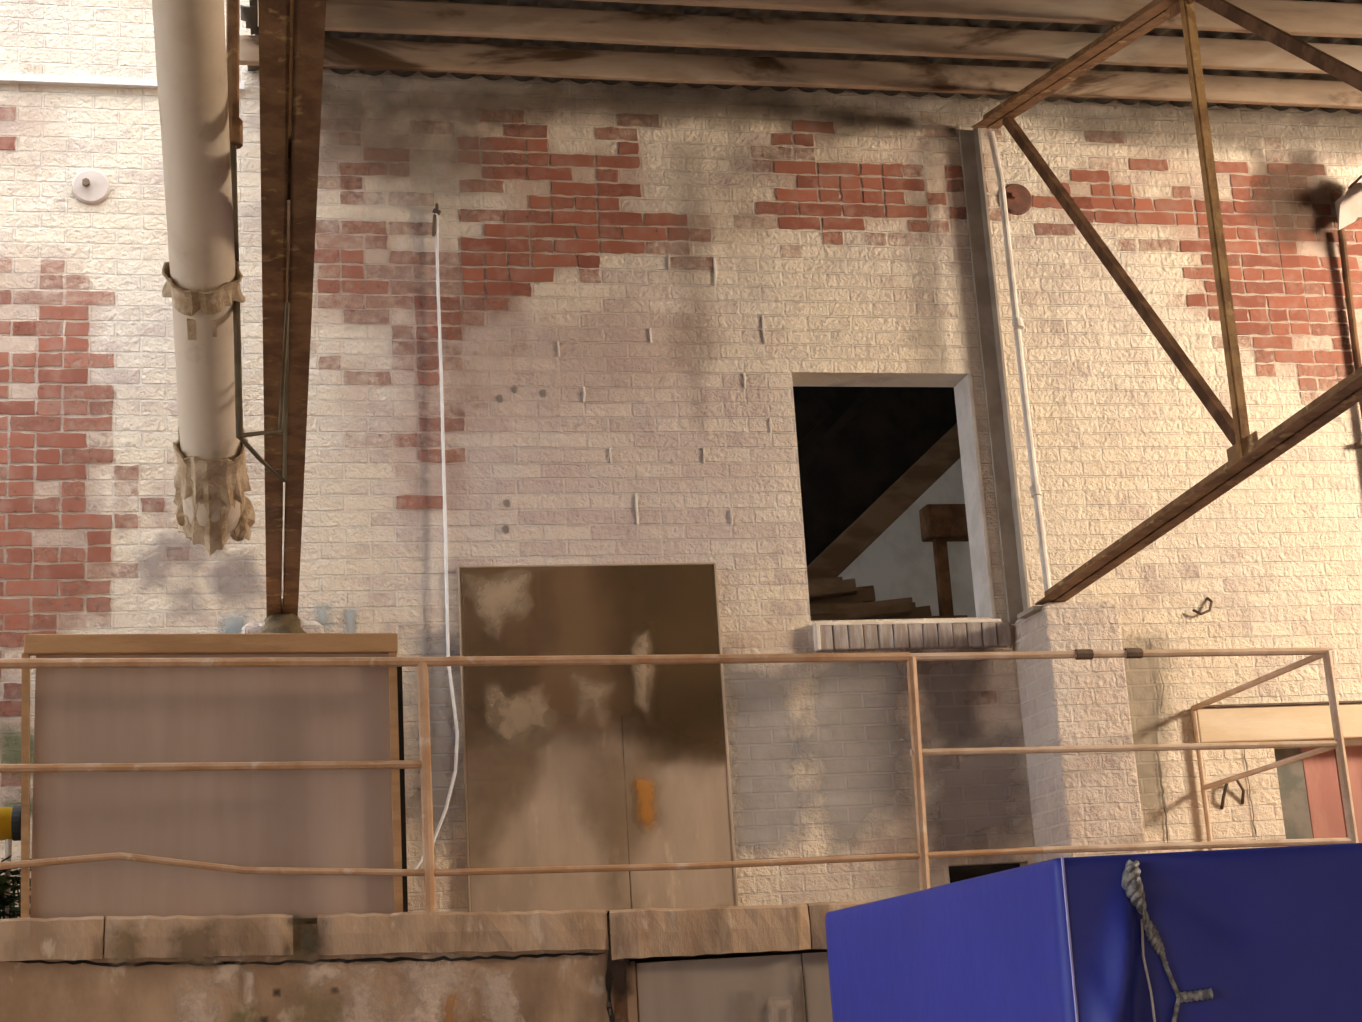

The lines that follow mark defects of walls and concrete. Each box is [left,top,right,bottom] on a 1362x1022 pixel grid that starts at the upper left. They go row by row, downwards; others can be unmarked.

damp [383,92,710,120]
damp [734,100,798,121]
damp [825,107,913,131]
damp [1075,116,1362,145]
peeling [756,120,967,245]
damp [1261,156,1335,241]
peeling [314,111,713,386]
peeling [1032,158,1362,391]
peeling [400,417,465,463]
peeling [0,266,165,716]
peeling [396,495,443,509]
crack [7,911,615,1022]